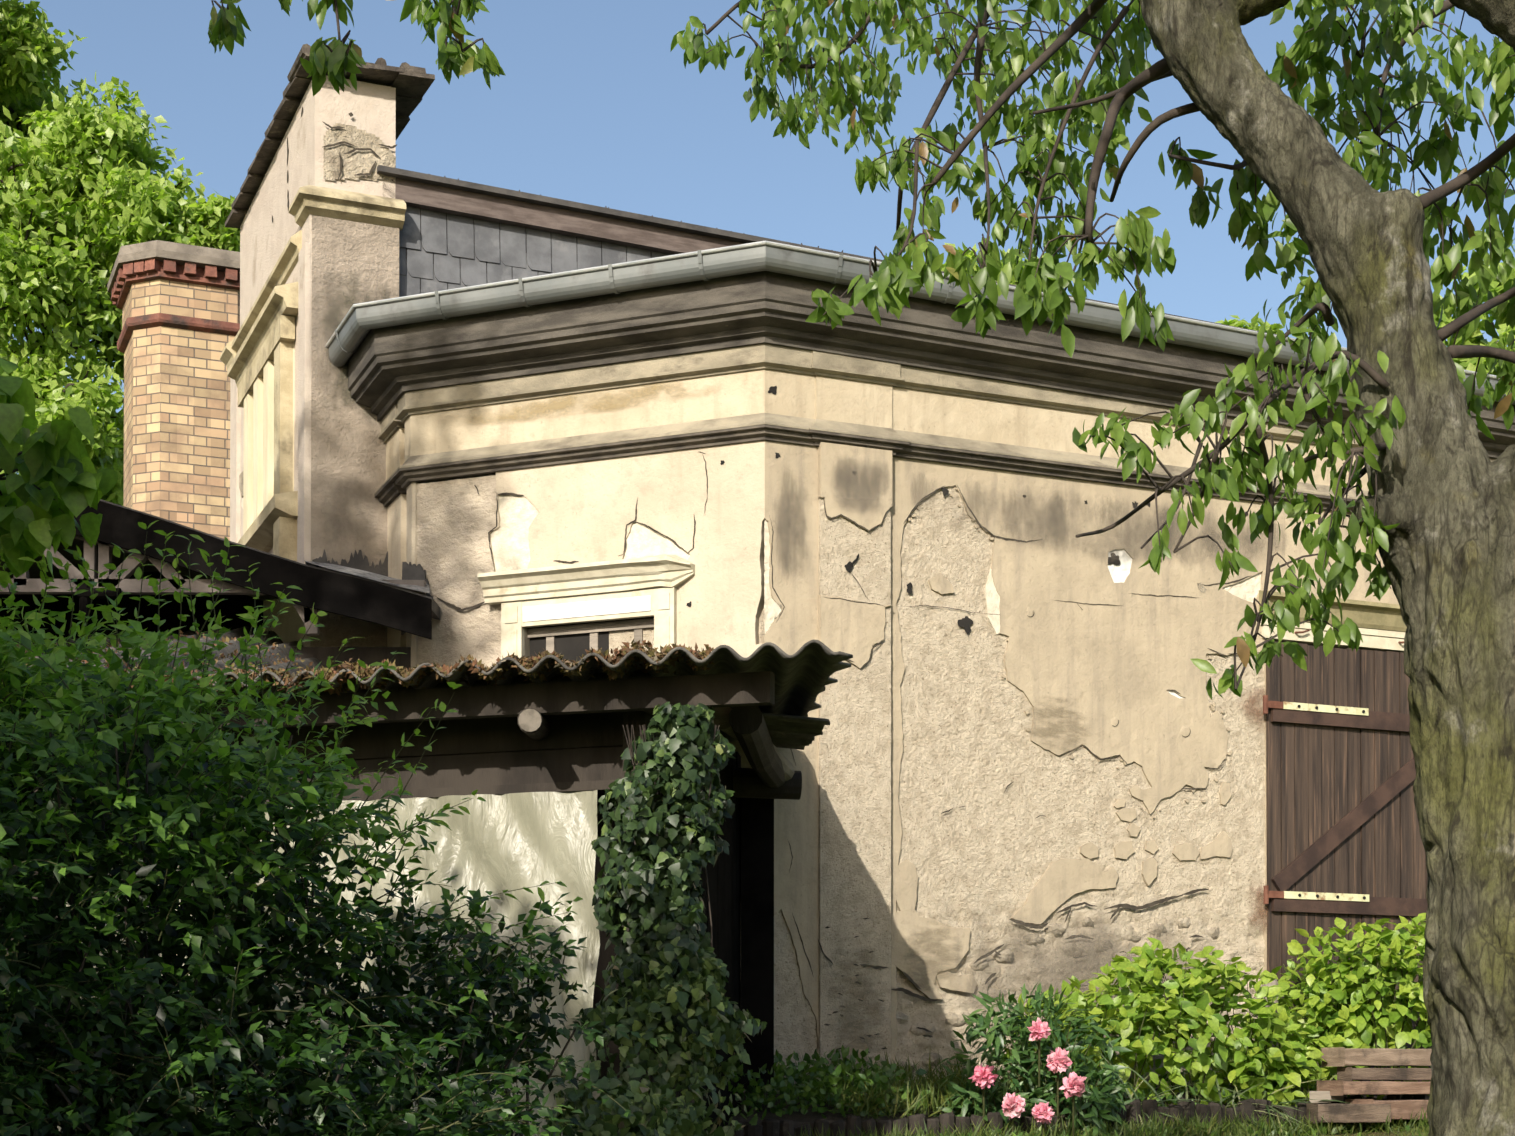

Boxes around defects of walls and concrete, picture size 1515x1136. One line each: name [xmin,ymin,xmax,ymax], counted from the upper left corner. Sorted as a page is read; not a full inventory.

spalling [322,112,397,181]
spalling [416,475,539,671]
damp [836,470,875,509]
spalling [774,486,1265,1092]